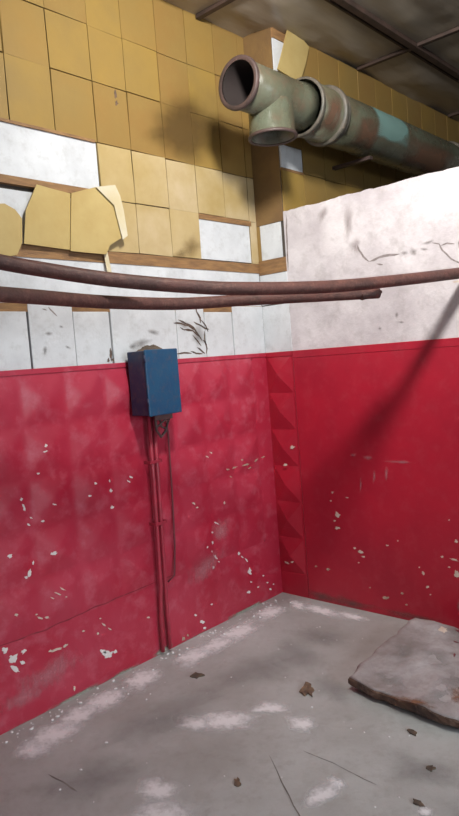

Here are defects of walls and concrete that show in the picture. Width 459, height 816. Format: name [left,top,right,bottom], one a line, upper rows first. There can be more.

corrosion [322,101,341,132]
corrosion [406,141,447,173]
crack [357,245,399,265]
crack [434,242,459,263]
crack [270,757,300,816]